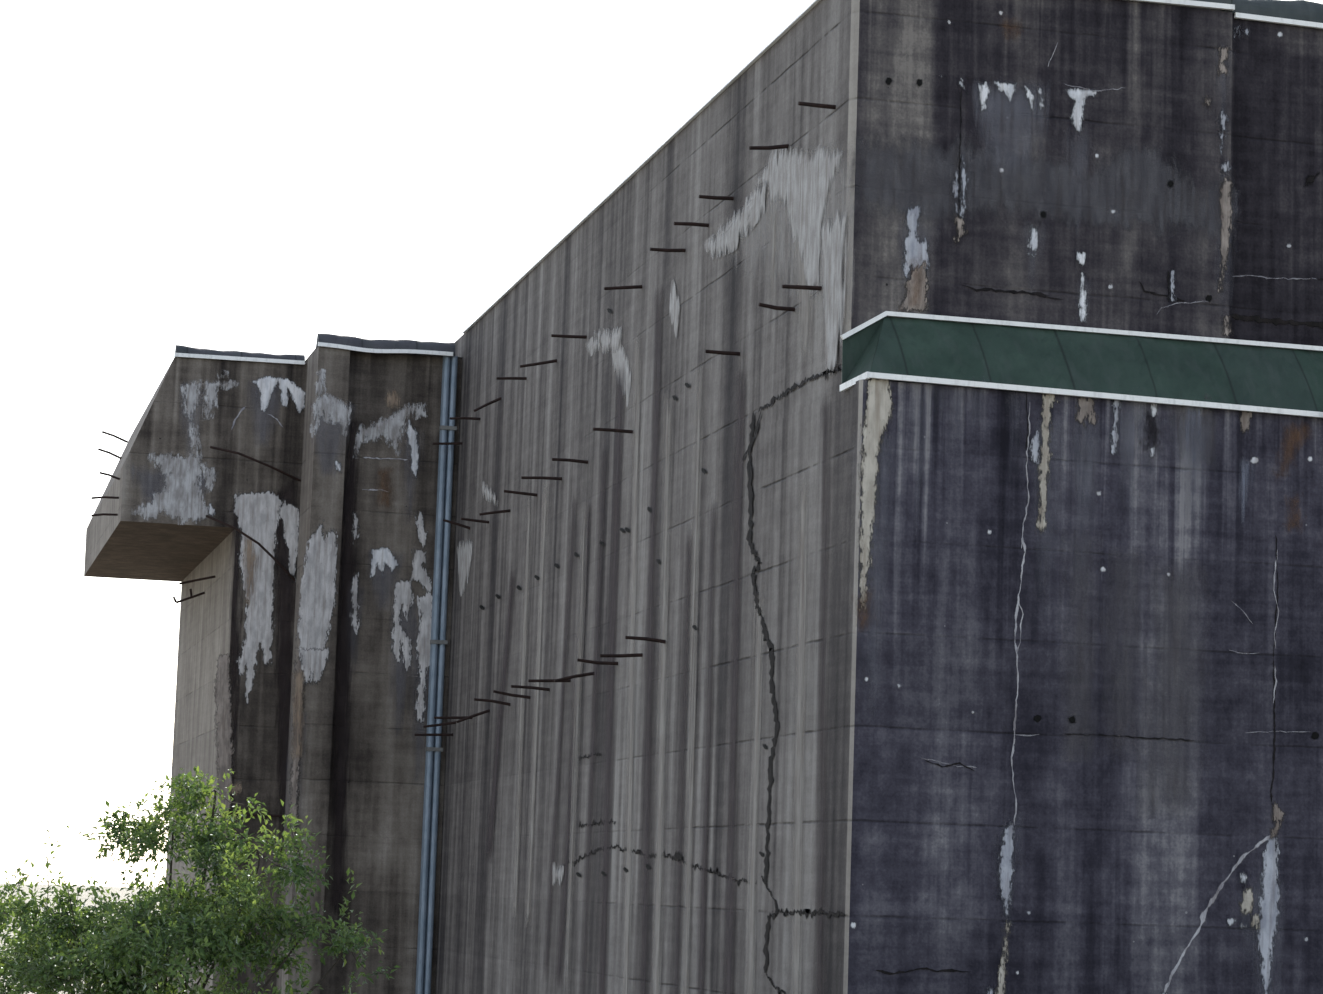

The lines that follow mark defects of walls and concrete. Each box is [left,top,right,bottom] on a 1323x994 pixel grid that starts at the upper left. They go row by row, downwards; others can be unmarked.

peeling [959,78,1044,111]
peeling [1065,84,1123,134]
peeling [133,369,426,525]
peeling [214,491,433,893]
leakage [487,496,547,919]
leakage [546,301,714,994]
crack [552,366,845,994]
leakage [724,377,762,994]
leakage [792,405,828,994]
crack [876,393,1194,994]
crack [1160,835,1270,994]
crack [1231,535,1305,802]